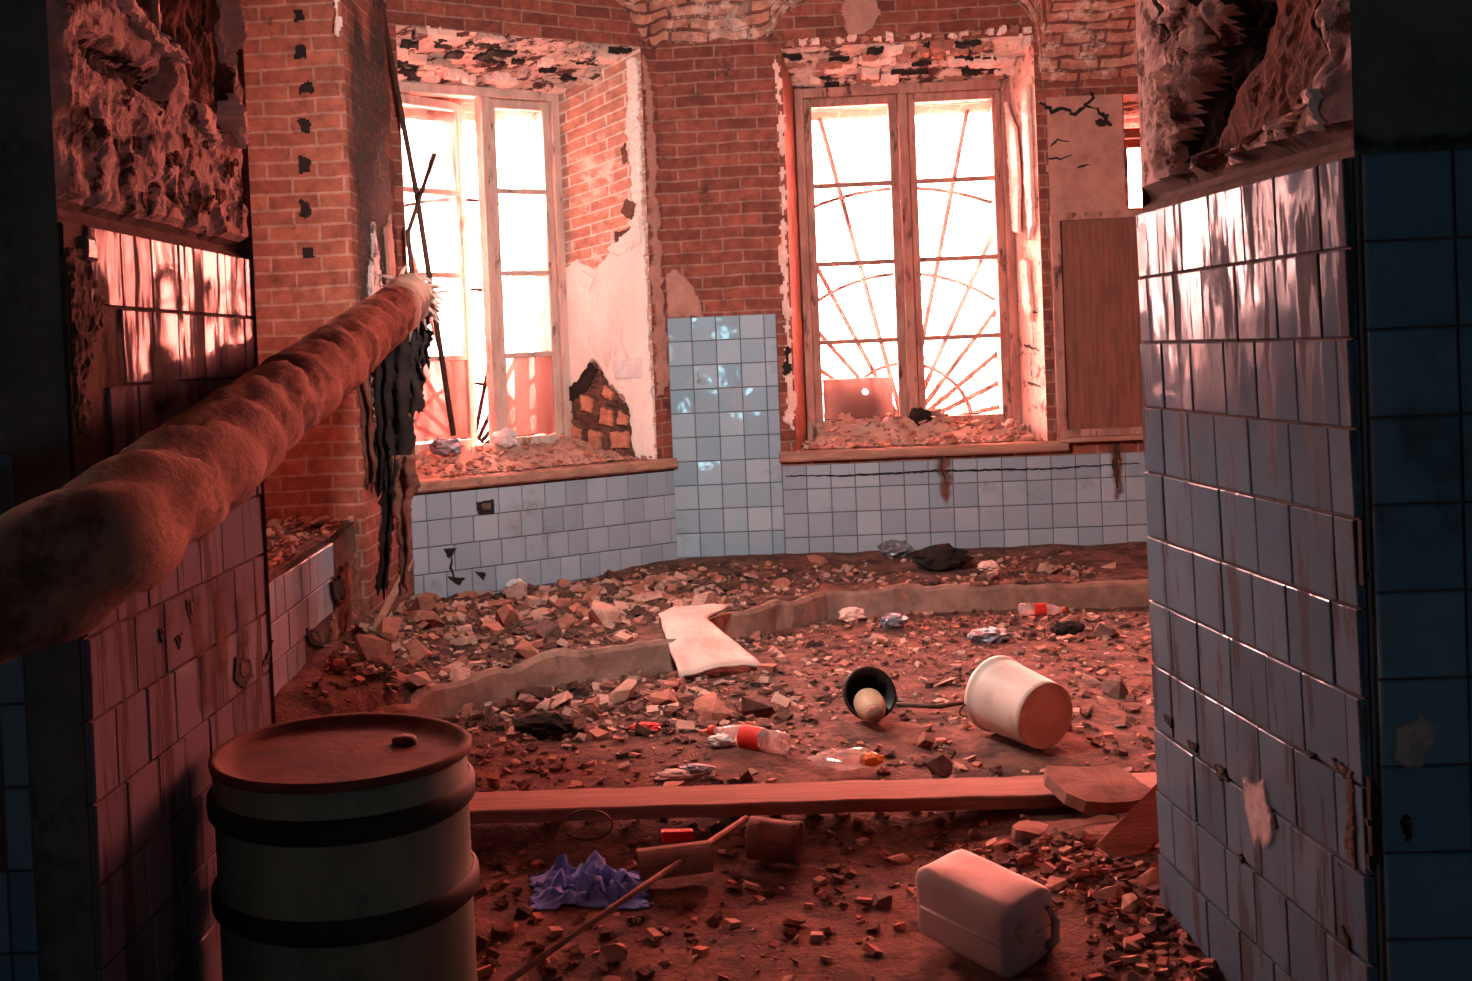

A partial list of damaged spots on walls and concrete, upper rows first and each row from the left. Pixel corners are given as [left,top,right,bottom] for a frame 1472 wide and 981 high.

flaking render [86,106,142,164]
flaking render [116,0,250,222]
crack [1039,91,1112,168]
flaking render [1148,64,1174,100]
flaking render [1152,0,1329,168]
flaking render [397,26,704,459]
spalling [772,24,1036,430]
peeling [1019,258,1041,388]
spalling [1267,807,1278,829]